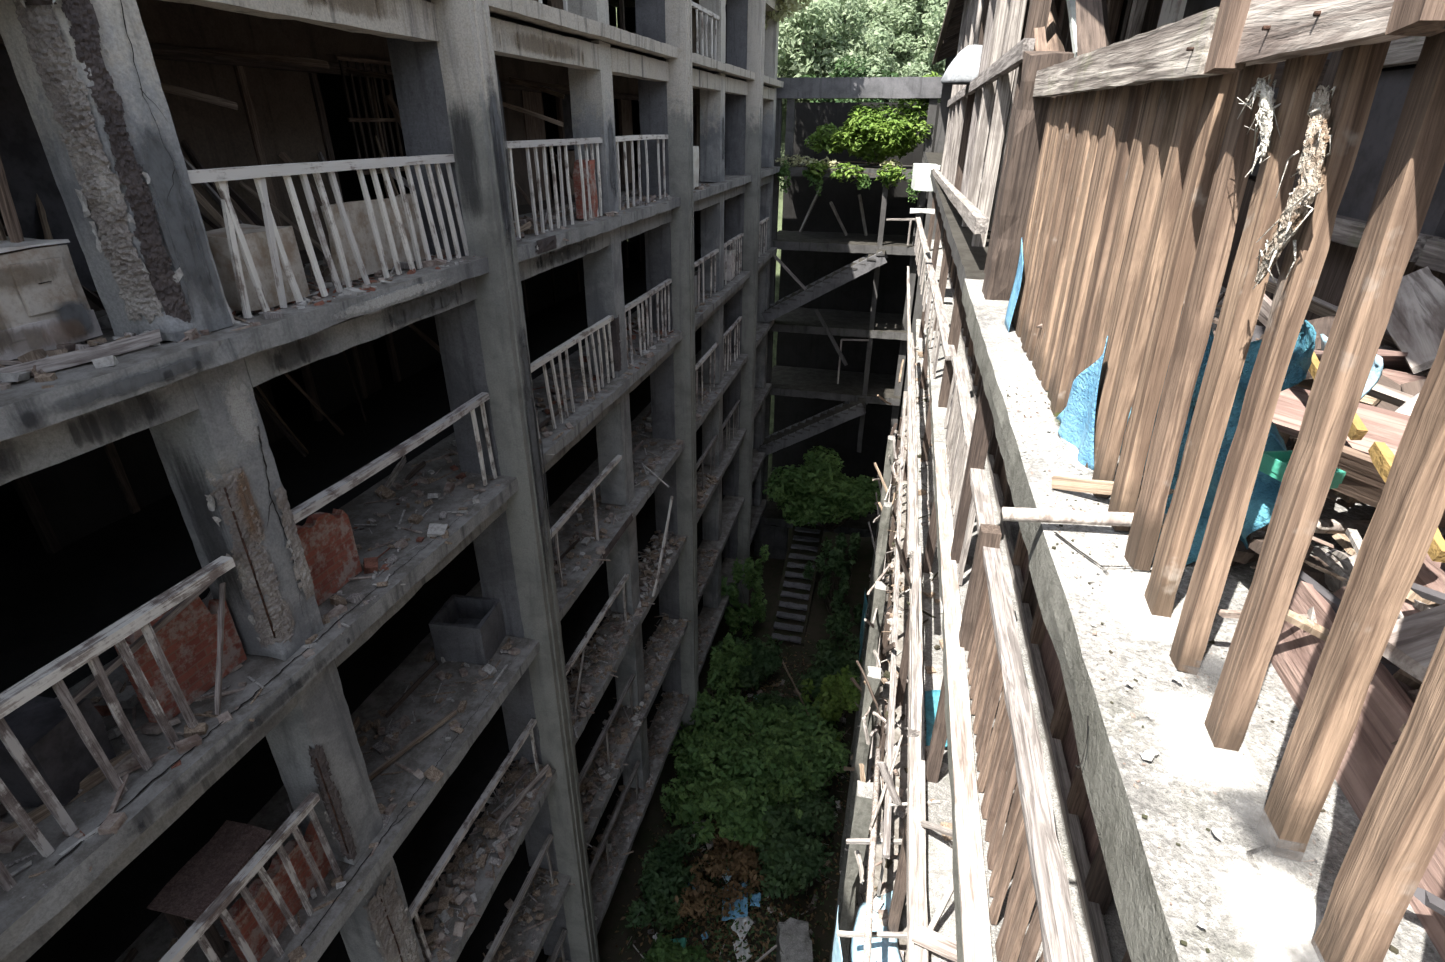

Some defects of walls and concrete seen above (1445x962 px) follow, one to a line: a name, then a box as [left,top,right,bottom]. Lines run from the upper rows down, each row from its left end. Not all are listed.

spalling [13,0,192,324]
spalling [205,467,315,648]
spalling [308,744,357,861]
damp [1230,792,1323,864]
damp [1296,949,1325,962]